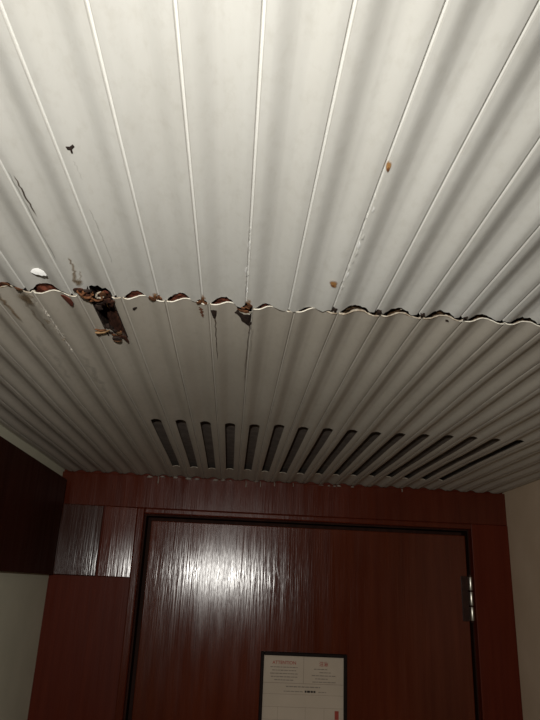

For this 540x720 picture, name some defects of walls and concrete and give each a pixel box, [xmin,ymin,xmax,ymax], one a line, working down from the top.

crack [0,282,81,306]
peeling [73,288,115,310]
peeling [235,303,256,326]
crack [104,290,540,327]